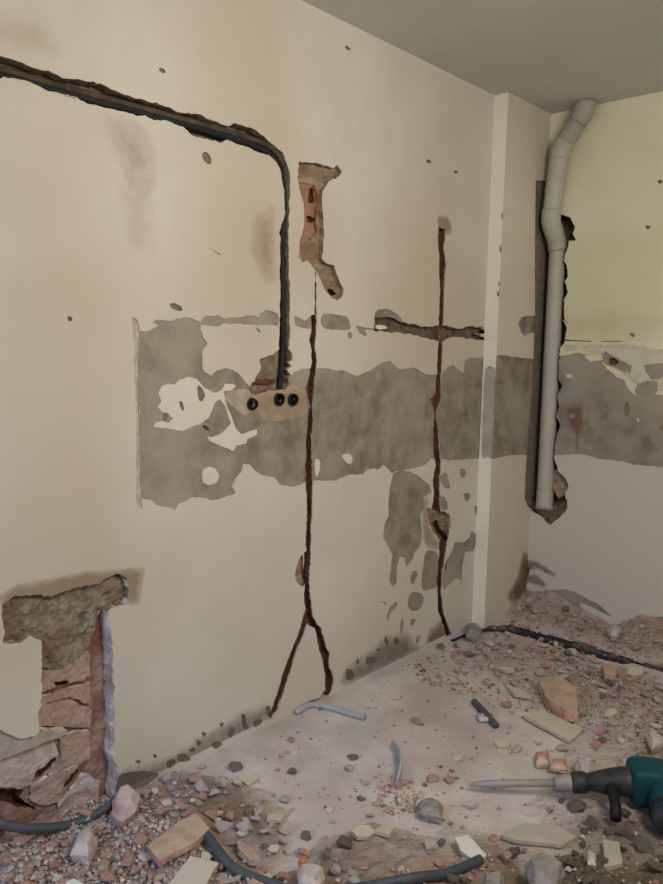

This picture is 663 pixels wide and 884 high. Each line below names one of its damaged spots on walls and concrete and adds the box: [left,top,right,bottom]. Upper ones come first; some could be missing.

spalling [297,162,343,300]
flaking render [554,351,663,467]
flaking render [132,303,533,680]
spalling [0,574,159,835]
flaking render [167,706,271,768]